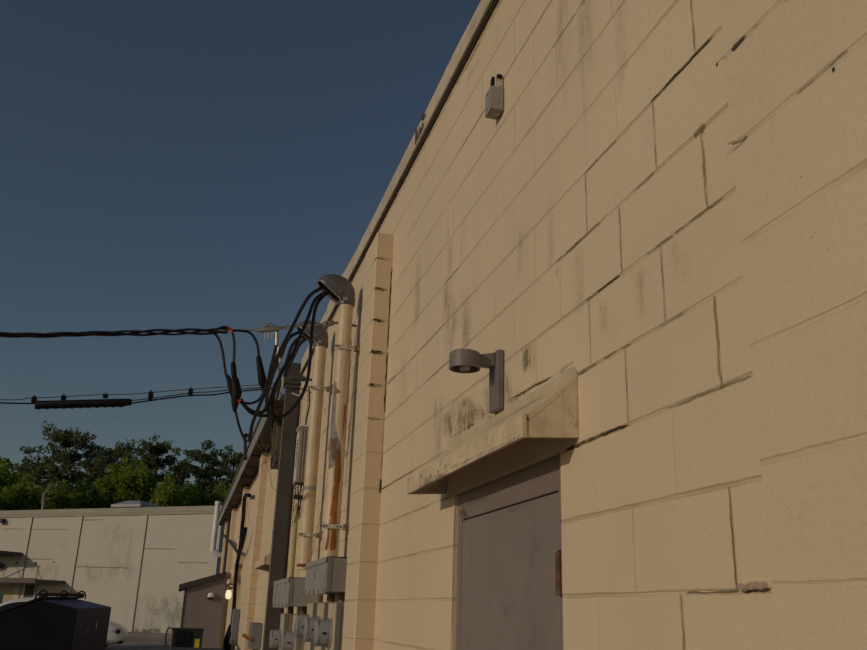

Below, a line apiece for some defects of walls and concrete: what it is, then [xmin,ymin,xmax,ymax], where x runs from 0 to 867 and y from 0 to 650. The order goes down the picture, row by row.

crack [556,205,622,333]
crack [636,0,711,189]
crack [646,124,722,326]
crack [726,136,746,155]
crack [379,271,414,493]
crack [565,344,630,451]
crack [665,295,749,409]
crack [679,486,739,650]